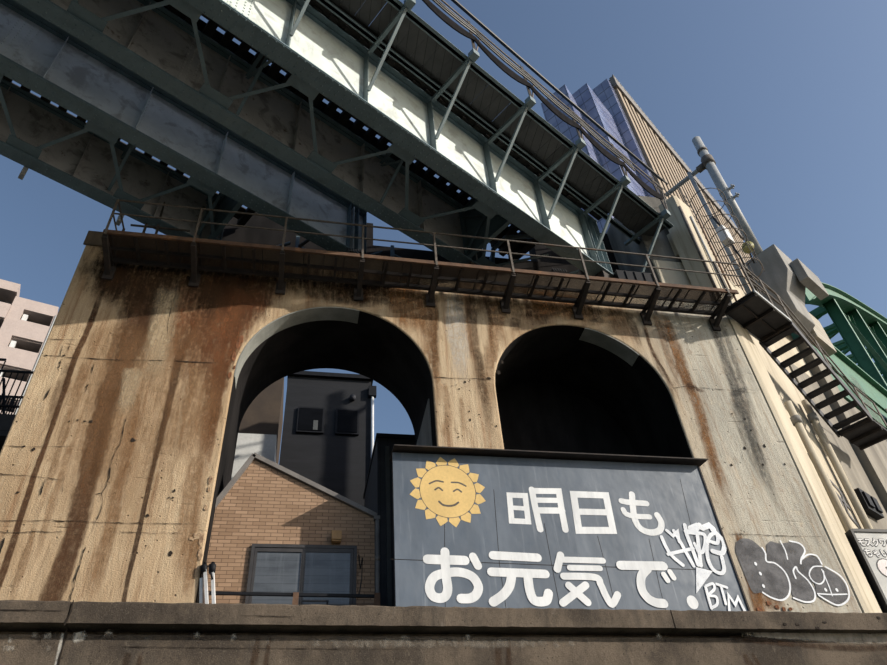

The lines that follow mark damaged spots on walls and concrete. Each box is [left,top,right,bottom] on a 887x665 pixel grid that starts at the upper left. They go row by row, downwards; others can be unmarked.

rust [0,301,99,587]
rust [40,284,158,601]
rust [390,288,439,378]
rust [467,305,498,397]
rust [517,292,602,325]
rust [635,321,722,478]
damp [711,329,766,475]
crack [0,419,181,665]